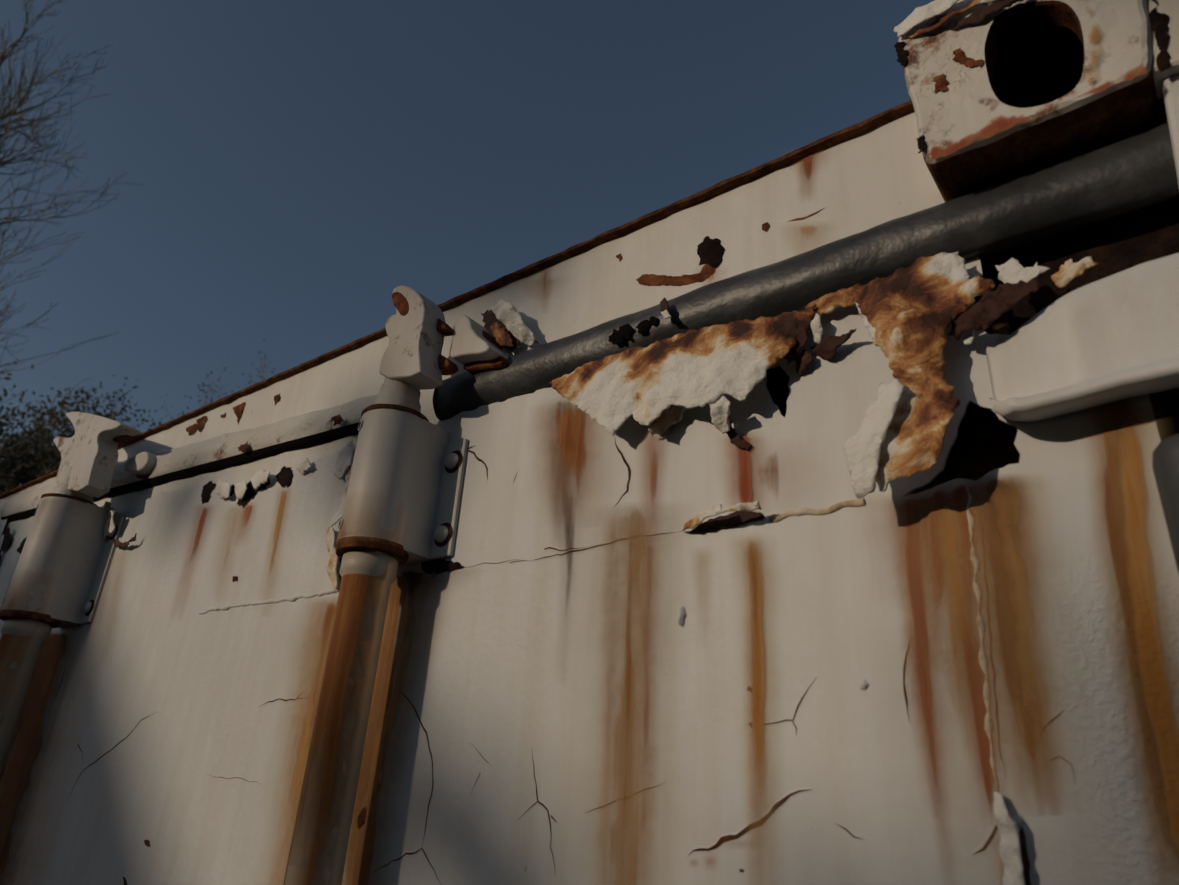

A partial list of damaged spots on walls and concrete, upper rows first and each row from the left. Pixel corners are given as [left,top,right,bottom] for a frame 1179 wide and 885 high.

peeling [894,0,1019,67]
rust [636,236,725,286]
peeling [549,251,1099,499]
peeling [201,458,311,508]
crack [463,529,681,568]
crack [612,435,634,509]
peeling [681,501,764,534]
rust [747,542,765,785]
rust [903,480,1047,808]
rust [1099,399,1179,861]
crack [516,746,666,877]
crack [687,787,812,857]